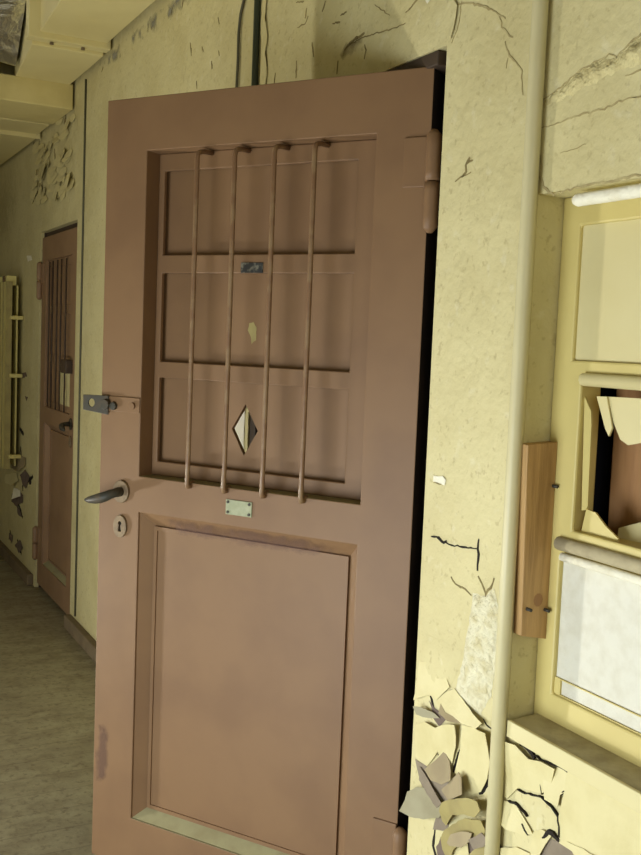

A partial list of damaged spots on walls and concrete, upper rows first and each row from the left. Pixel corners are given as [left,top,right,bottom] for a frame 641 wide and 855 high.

crack [296,1,347,28]
crack [336,0,417,74]
crack [451,1,523,95]
crack [543,33,641,100]
crack [542,96,641,128]
peeling [30,106,77,208]
peeling [5,446,33,518]
crack [431,536,495,597]
peeling [399,661,491,855]
peeling [503,742,555,799]
peeling [499,772,641,855]